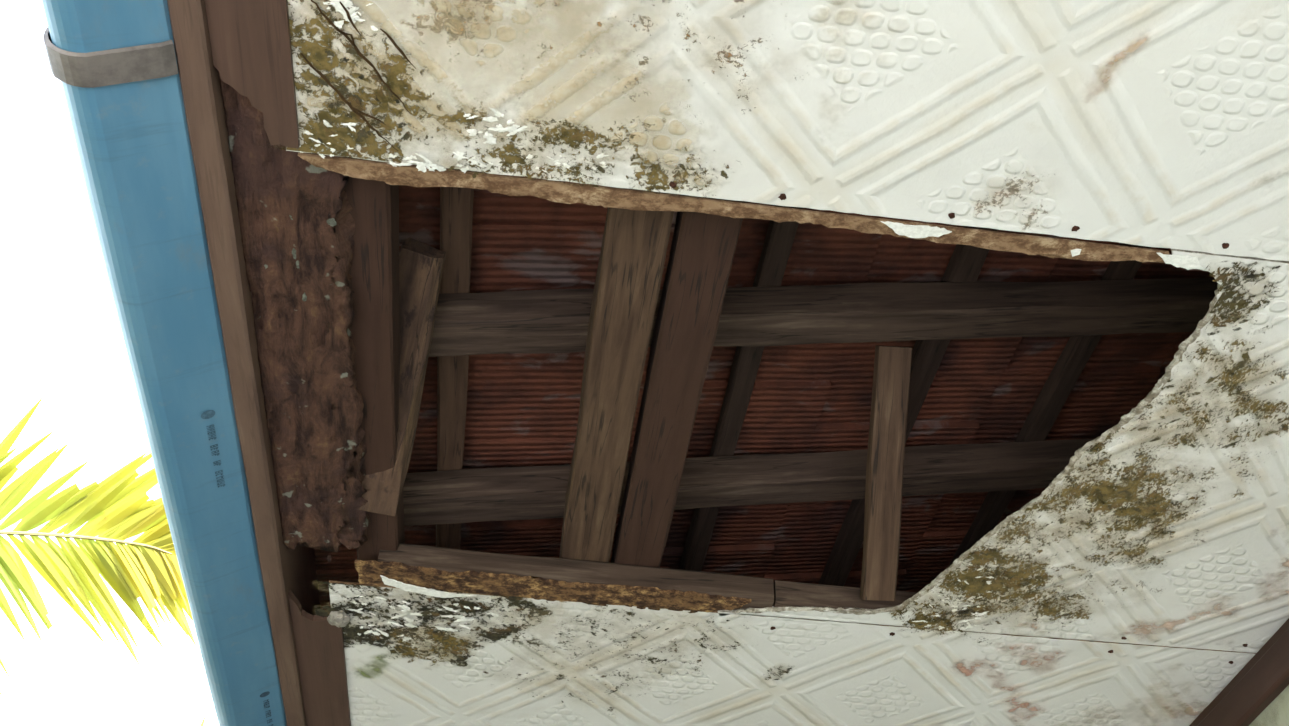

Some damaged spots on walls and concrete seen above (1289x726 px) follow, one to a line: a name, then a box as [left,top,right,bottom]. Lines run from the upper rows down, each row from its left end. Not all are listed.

peeling [299,120,357,158]
peeling [387,107,527,173]
water stain [268,0,729,194]
water stain [628,0,762,111]
peeling [881,221,952,238]
peeling [1157,253,1205,270]
spalling [734,299,1217,615]
water stain [890,261,1289,643]
peeling [380,575,477,598]
water stain [315,581,749,715]